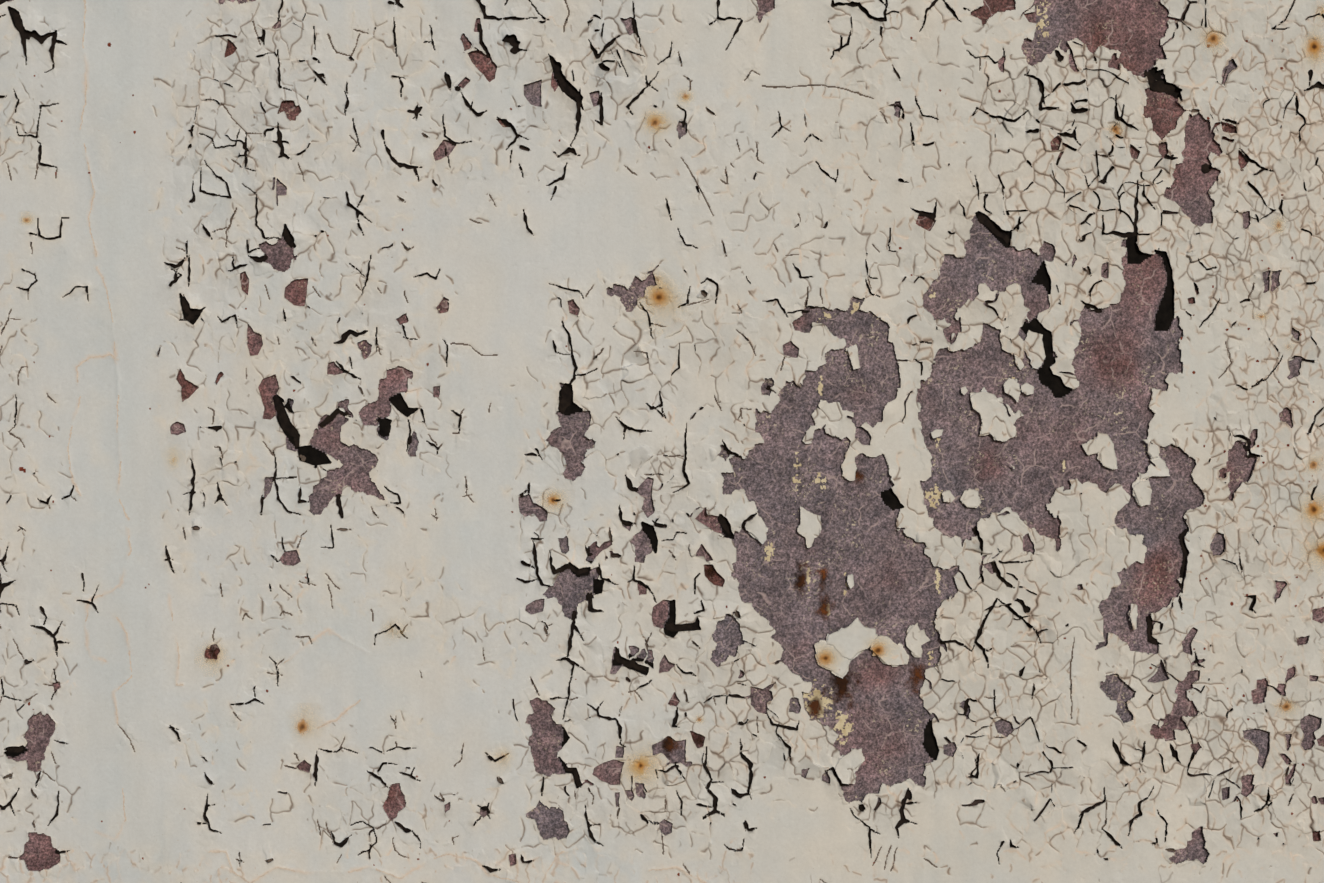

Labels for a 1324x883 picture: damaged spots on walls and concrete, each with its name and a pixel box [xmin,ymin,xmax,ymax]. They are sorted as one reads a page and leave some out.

peeling [0,0,52,59]
crack [0,0,67,181]
peeling [440,0,707,158]
peeling [170,0,441,521]
crack [164,103,498,721]
crack [253,0,939,747]
peeling [505,0,1324,879]
rust [795,563,829,616]
rust [662,736,678,752]
crack [541,713,799,875]
rust [808,699,821,716]
rust [818,652,859,705]